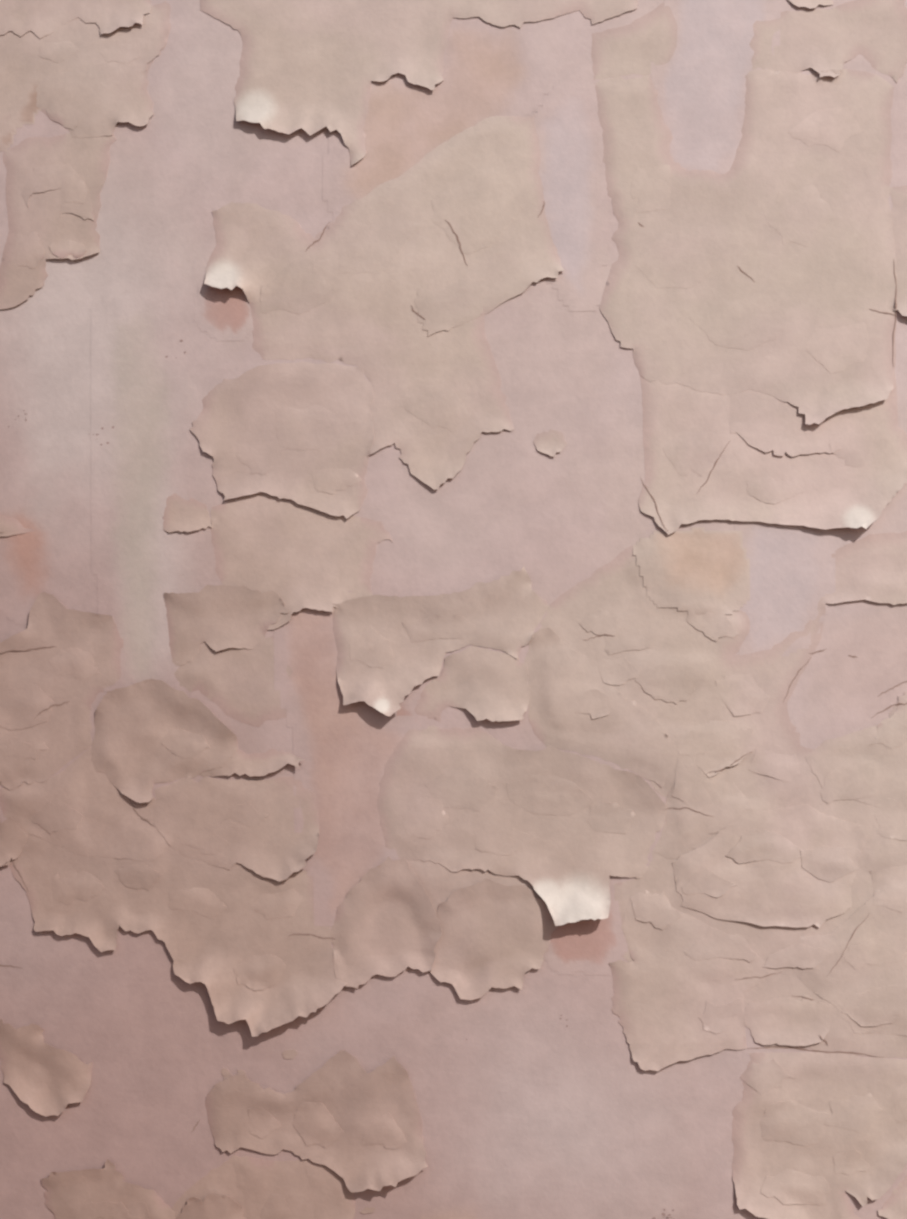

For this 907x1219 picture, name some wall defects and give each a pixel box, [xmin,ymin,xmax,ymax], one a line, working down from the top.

peeling [0,0,171,309]
peeling [162,114,567,728]
peeling [200,0,638,166]
peeling [591,0,907,535]
peeling [0,531,907,1219]